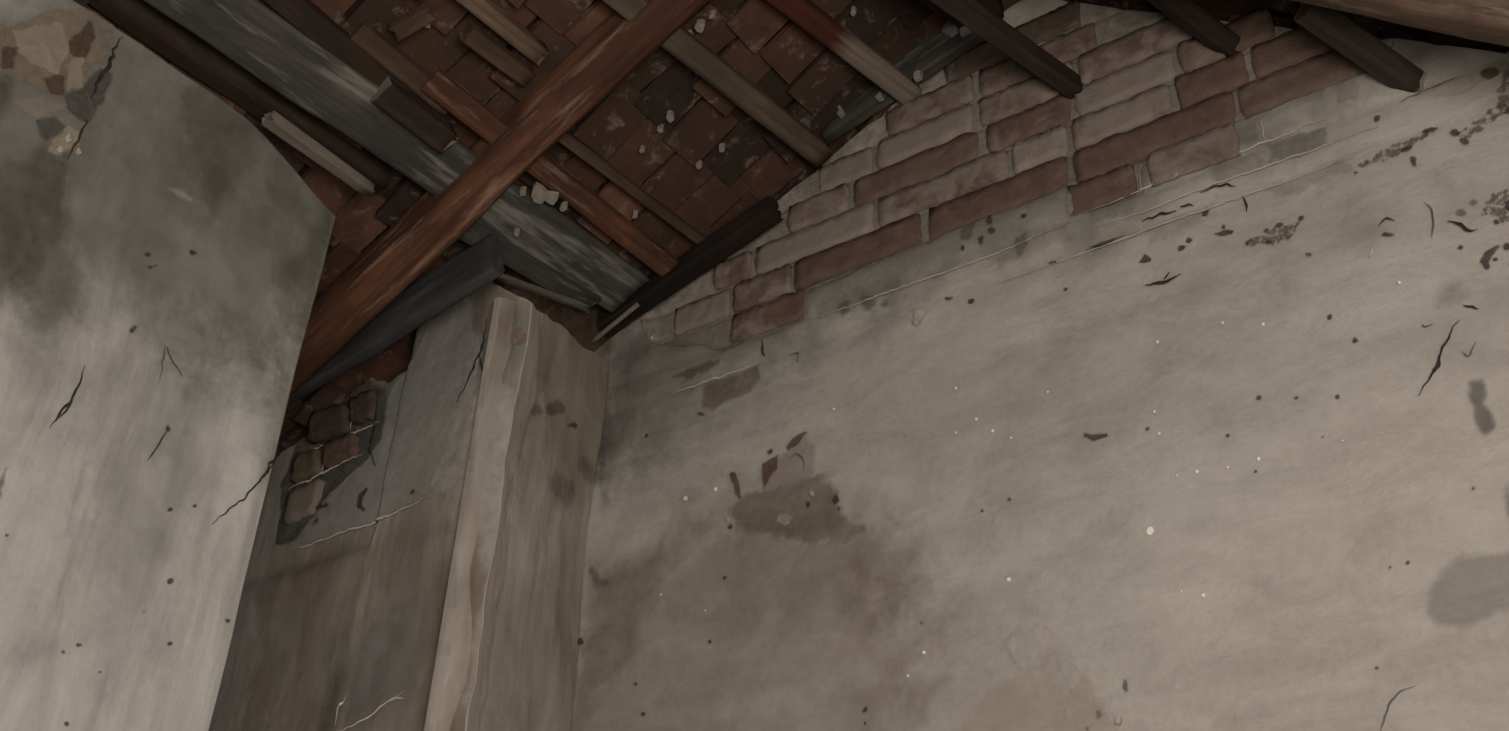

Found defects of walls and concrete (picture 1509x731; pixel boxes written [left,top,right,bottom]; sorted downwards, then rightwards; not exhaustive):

peeling [0,8,123,159]
flaking render [640,0,1509,416]
crack [1418,305,1478,396]
crack [50,366,85,427]
peeling [276,296,493,552]
damp [1471,382,1494,432]
crack [211,450,281,525]